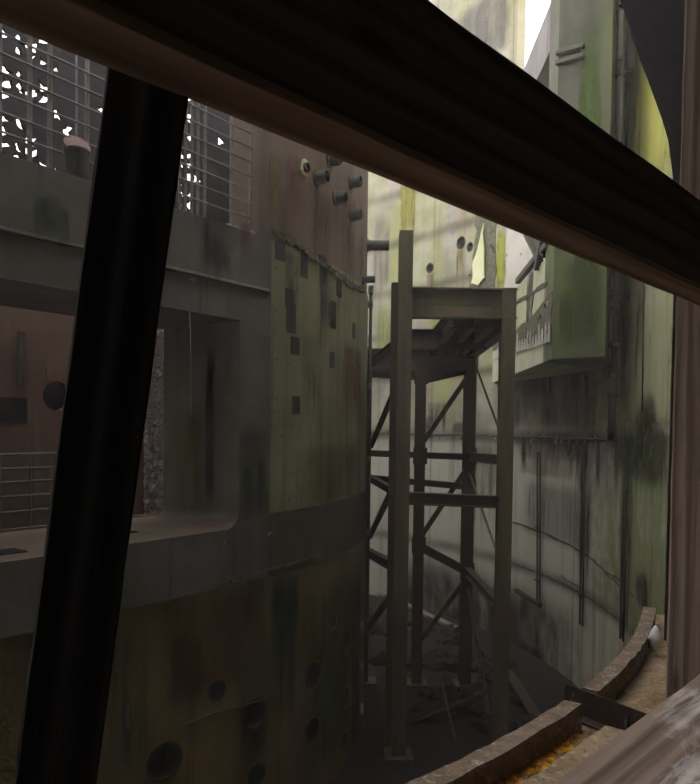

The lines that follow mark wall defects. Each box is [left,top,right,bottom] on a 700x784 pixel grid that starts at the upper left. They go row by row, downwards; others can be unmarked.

water stain [522,432,600,556]
crack [511,562,620,621]
crack [512,522,636,600]